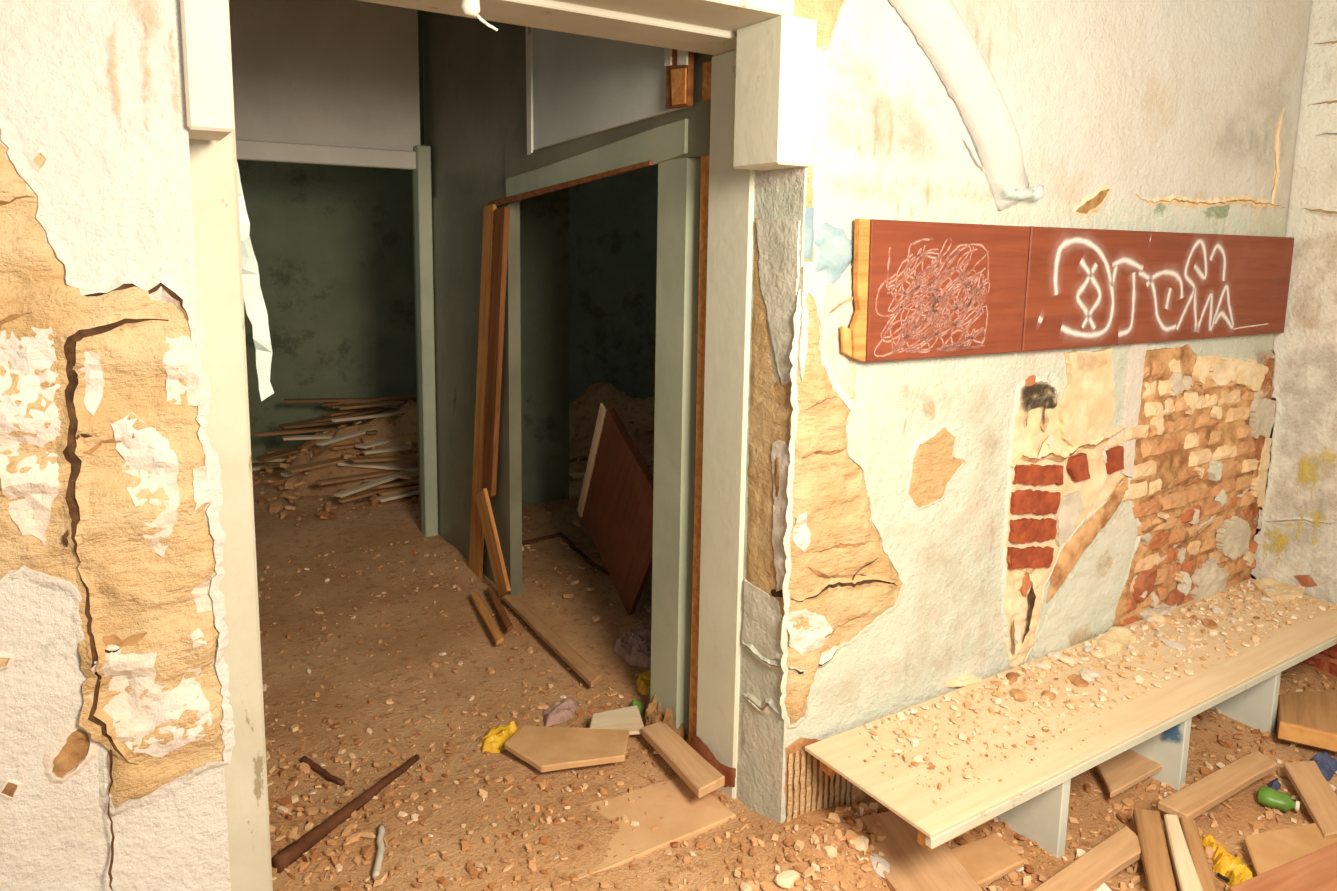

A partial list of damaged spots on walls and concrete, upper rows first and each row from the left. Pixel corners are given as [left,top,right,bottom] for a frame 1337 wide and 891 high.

spalling [789,0,847,52]
crack [1136,97,1337,217]
crack [1314,38,1337,48]
spalling [0,113,236,819]
crack [50,273,189,891]
spalling [742,130,905,729]
spalling [905,424,967,511]
flaking render [1001,340,1276,669]